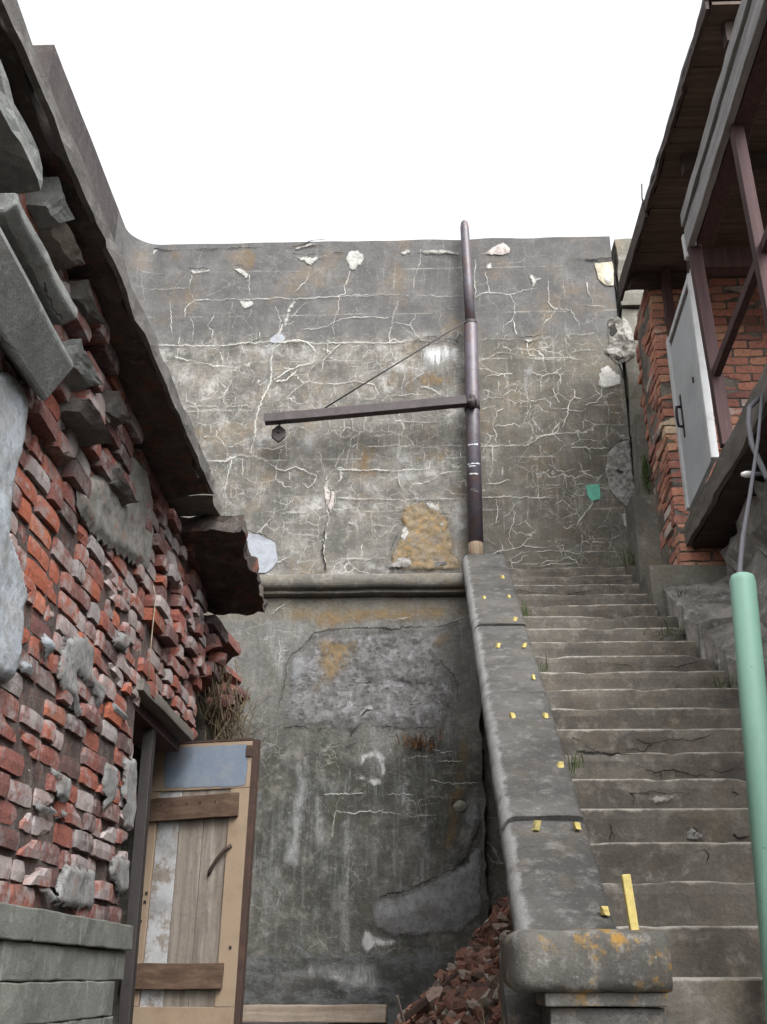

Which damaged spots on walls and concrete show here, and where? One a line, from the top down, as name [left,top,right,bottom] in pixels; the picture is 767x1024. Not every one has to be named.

crack [154,245,256,253]
spalling [293,243,323,265]
spalling [346,251,364,270]
spalling [595,260,614,285]
spalling [598,315,636,388]
crack [170,239,634,594]
flaking render [0,371,34,682]
flaking render [76,455,153,574]
spalling [247,530,278,573]
spalling [389,499,460,570]
flaking render [40,633,129,721]
crack [629,733,739,806]